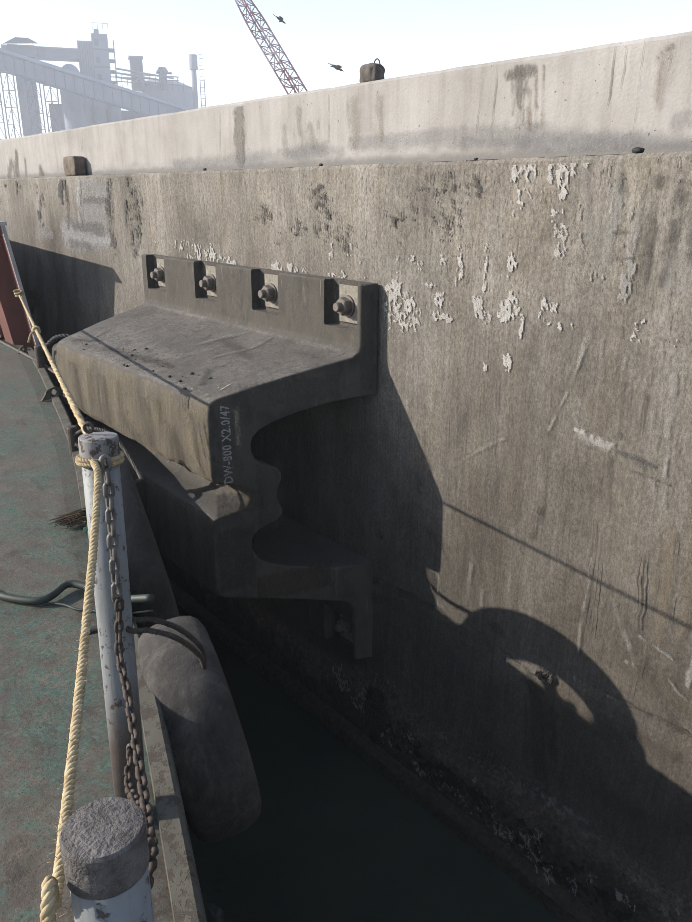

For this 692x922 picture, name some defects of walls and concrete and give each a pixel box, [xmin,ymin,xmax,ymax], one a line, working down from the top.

leakage [507,65,535,108]
peeling [510,164,536,216]
peeling [541,163,589,259]
peeling [379,255,423,333]
peeling [425,282,453,323]
peeling [472,243,524,338]
peeling [617,233,637,303]
peeling [502,353,512,372]
crack [635,558,645,629]